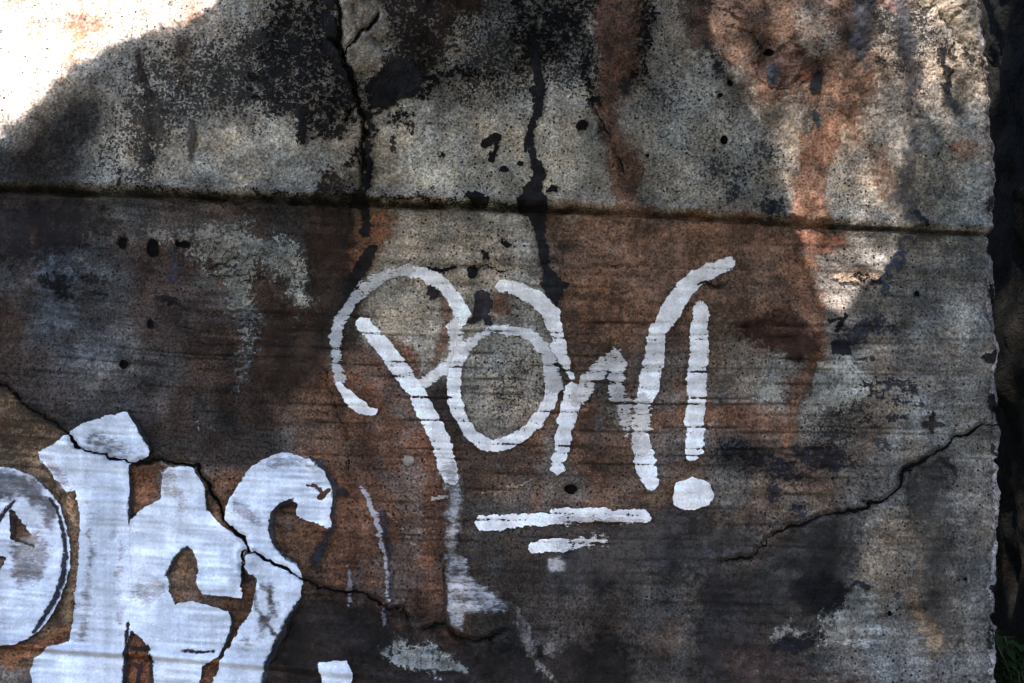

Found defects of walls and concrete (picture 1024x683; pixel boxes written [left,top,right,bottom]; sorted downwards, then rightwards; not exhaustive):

crack [329,0,379,189]
damp [244,0,603,202]
damp [616,0,661,97]
rust [547,0,913,498]
crack [0,370,507,642]
crack [719,423,1000,562]